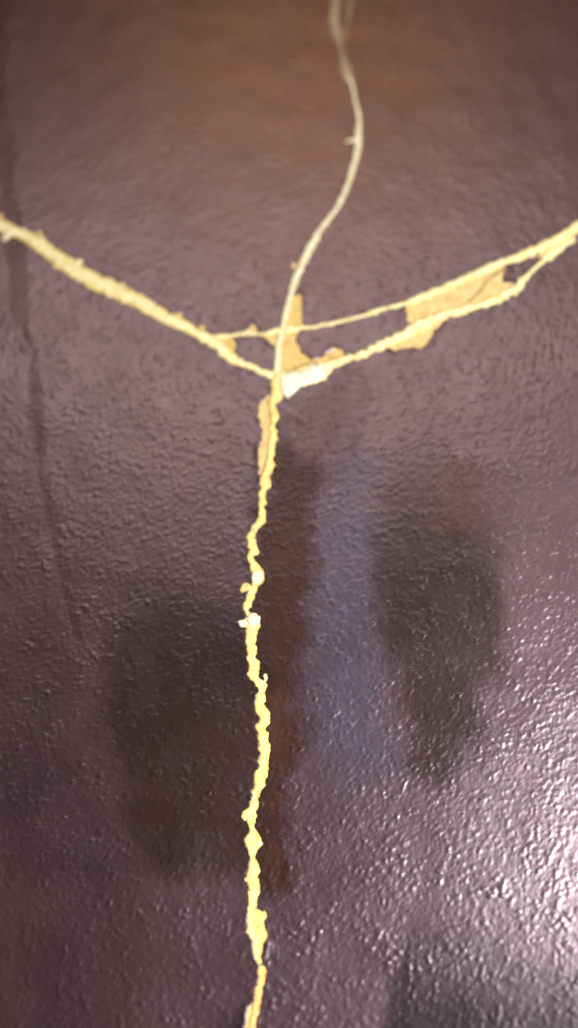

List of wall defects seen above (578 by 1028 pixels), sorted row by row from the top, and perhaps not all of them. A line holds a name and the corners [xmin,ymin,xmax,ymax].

crack [0,72,578,379]
peeling [248,294,345,372]
peeling [388,265,515,351]
damp [113,645,271,863]
crack [237,237,576,964]
damp [382,519,497,776]
crack [250,965,266,1028]